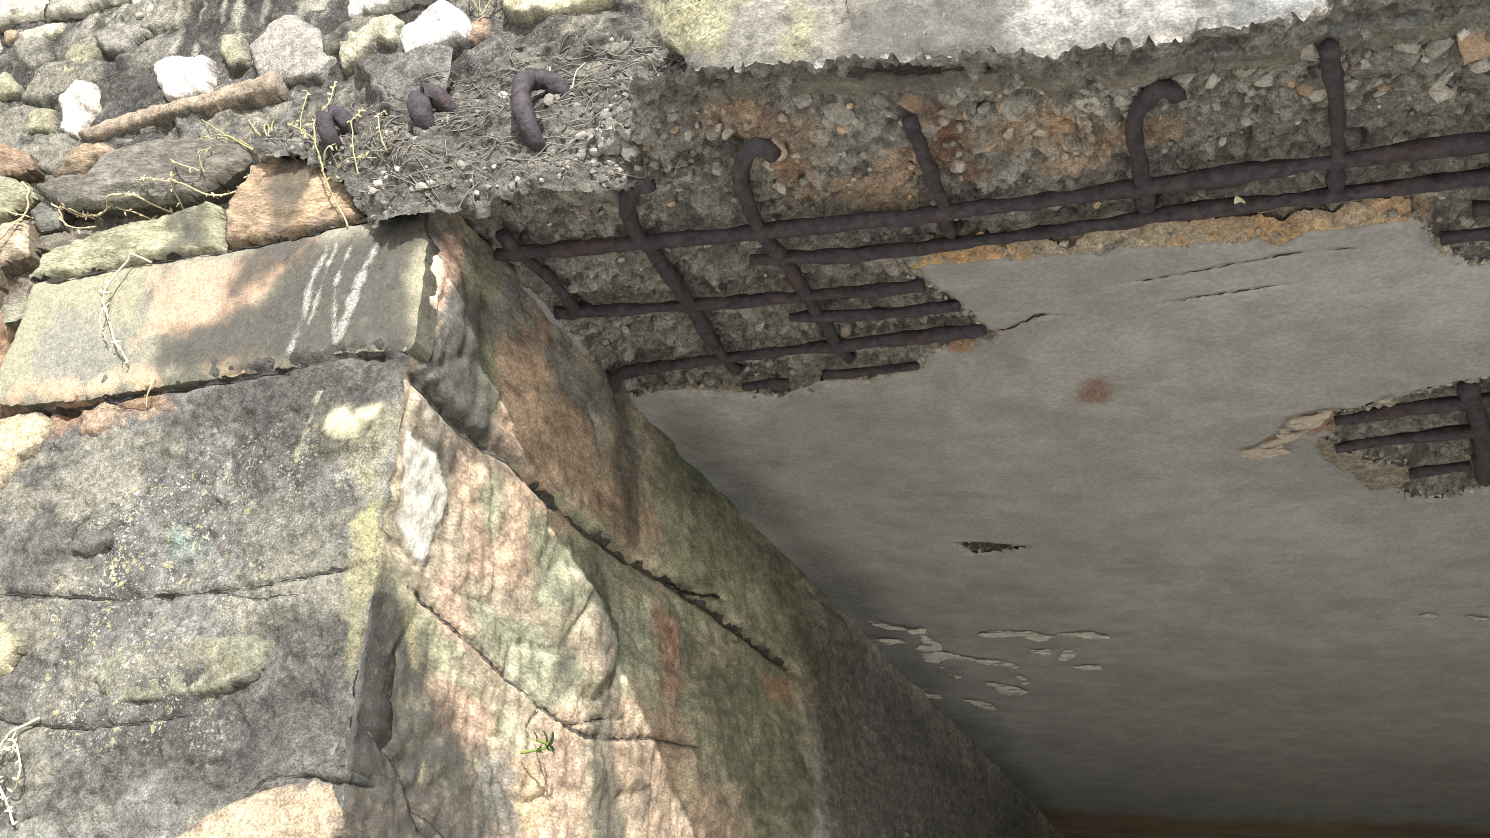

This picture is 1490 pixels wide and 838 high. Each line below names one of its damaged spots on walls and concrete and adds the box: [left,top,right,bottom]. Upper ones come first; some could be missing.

spalling [250,0,1490,399]
crack [1127,247,1350,302]
peeling [324,404,381,438]
spalling [1240,374,1490,503]
crack [0,354,787,671]
spalling [956,542,1018,552]
crack [412,589,699,749]
peeling [868,620,1029,710]
peeling [978,631,1110,670]
crack [0,714,188,730]
crack [358,719,445,838]